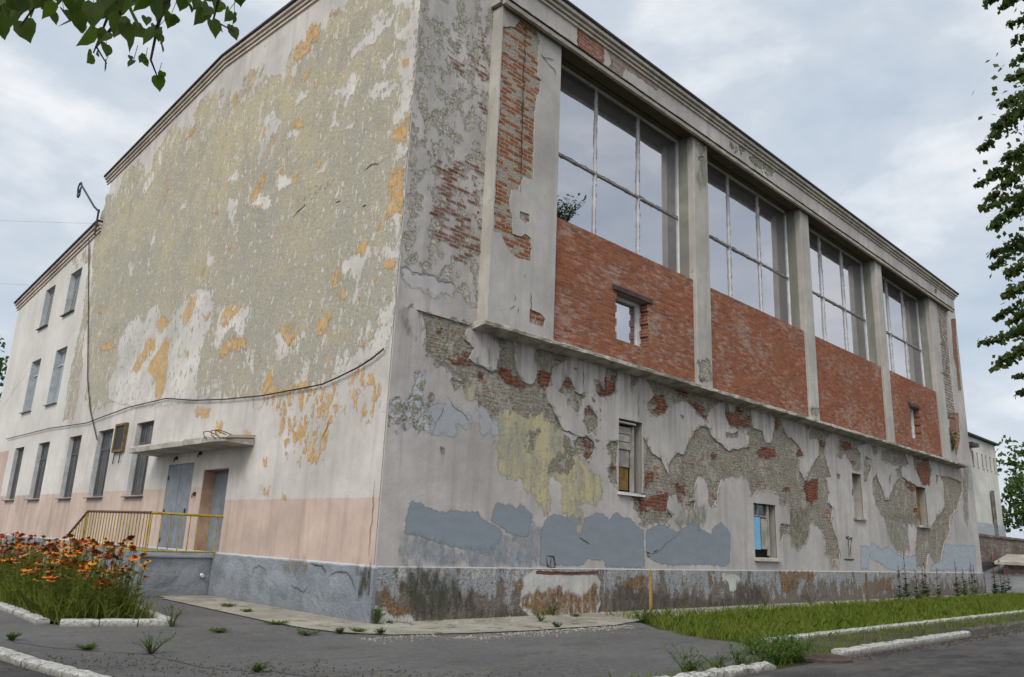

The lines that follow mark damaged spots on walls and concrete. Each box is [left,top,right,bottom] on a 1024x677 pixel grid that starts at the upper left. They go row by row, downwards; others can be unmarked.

peeling [63,0,962,572]
leakage [401,570,483,620]
leakage [598,578,761,612]